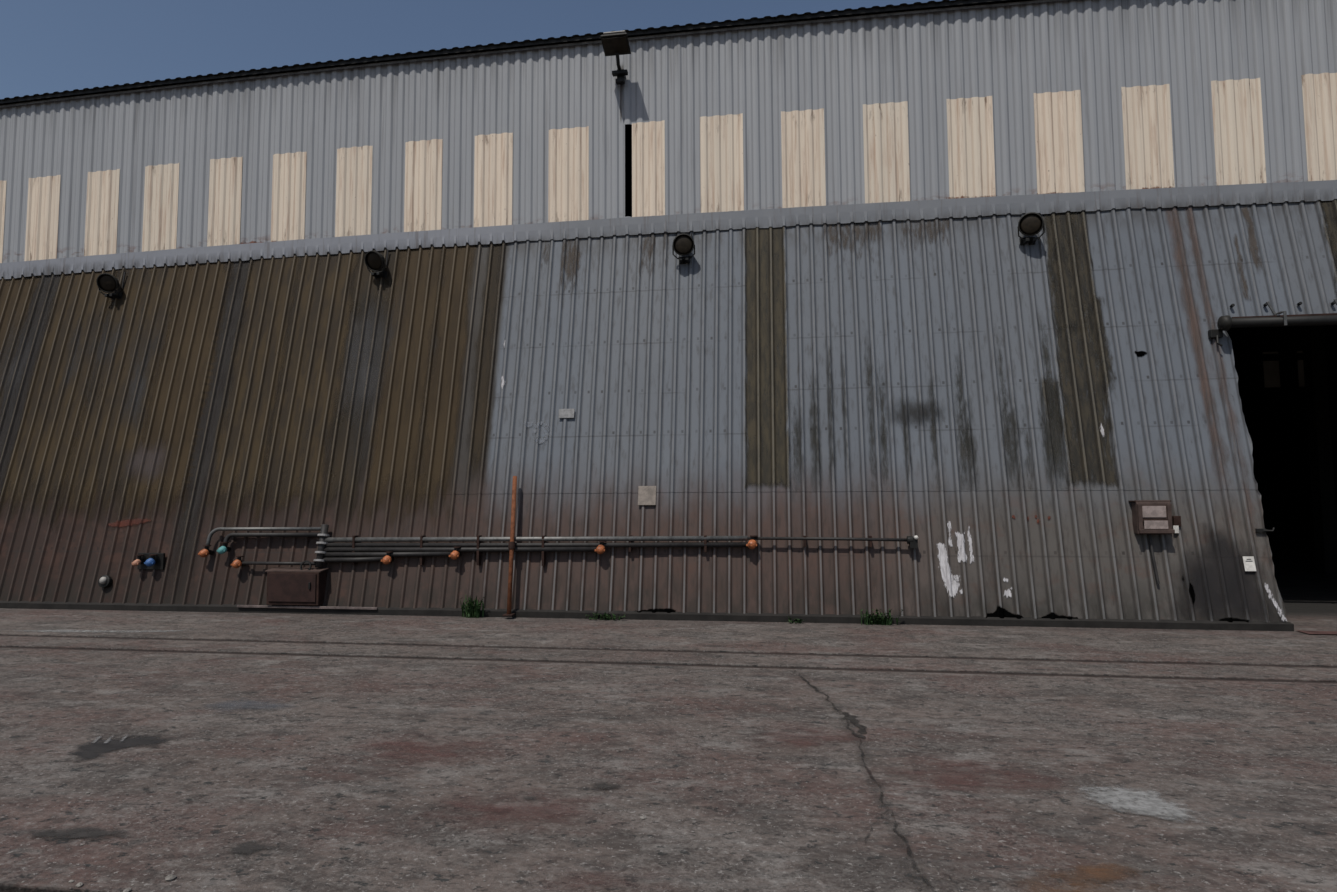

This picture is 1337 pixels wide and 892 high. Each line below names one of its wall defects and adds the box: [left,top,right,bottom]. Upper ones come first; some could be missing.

damp [794,367,846,470]
damp [867,367,888,478]
damp [957,378,976,472]
damp [73,735,166,761]
crack [800,676,933,888]